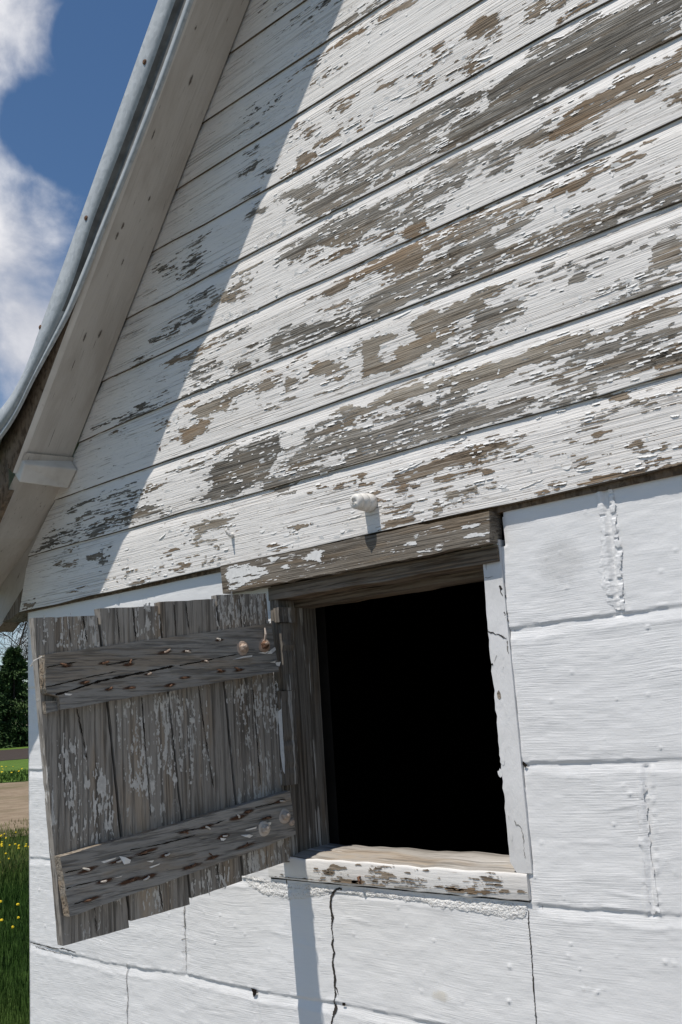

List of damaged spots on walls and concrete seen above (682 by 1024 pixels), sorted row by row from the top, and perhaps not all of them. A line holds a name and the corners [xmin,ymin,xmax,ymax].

peeling [30,0,682,630]
peeling [58,733,115,845]
peeling [115,689,215,799]
peeling [225,679,279,746]
rust [78,847,168,902]
spalling [191,841,527,920]
crack [329,887,342,1024]
crack [528,910,537,1022]